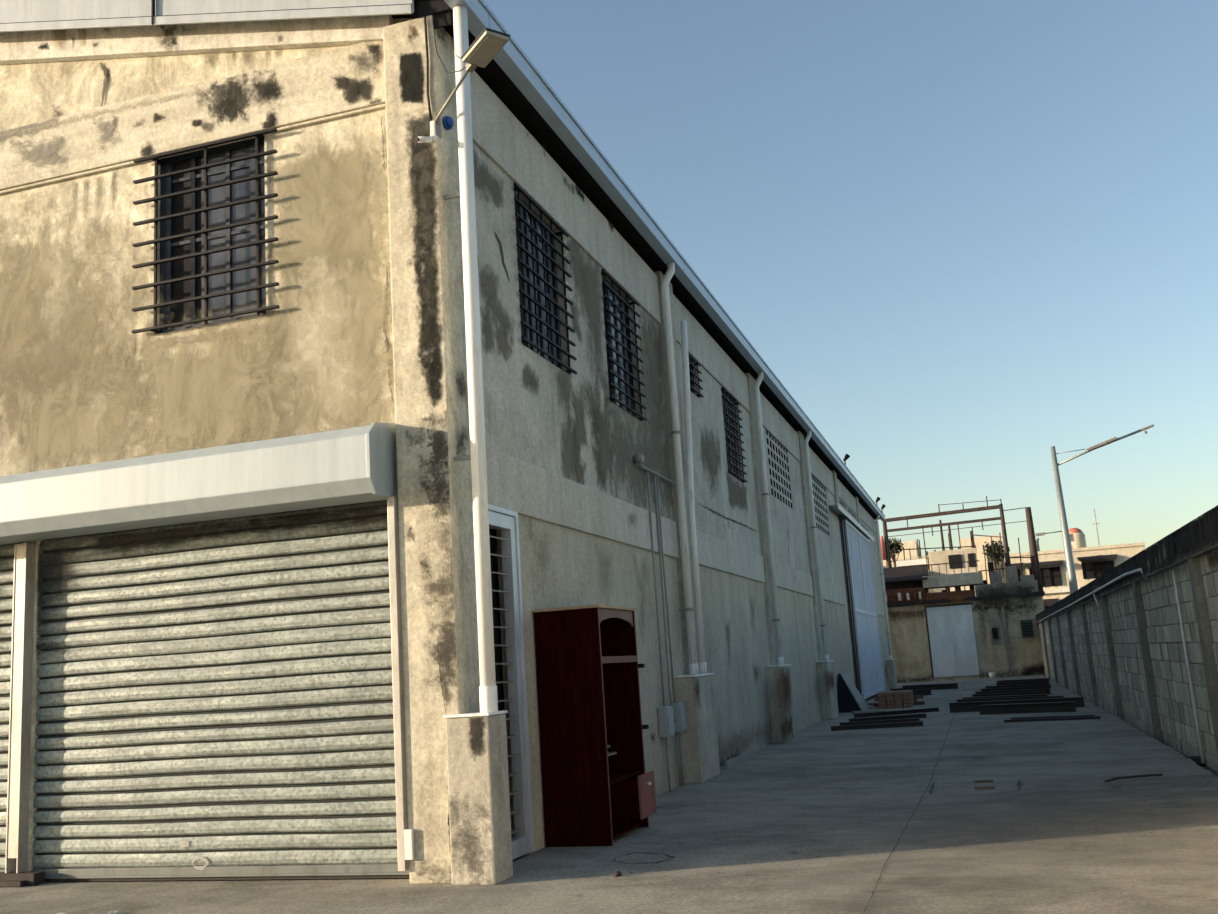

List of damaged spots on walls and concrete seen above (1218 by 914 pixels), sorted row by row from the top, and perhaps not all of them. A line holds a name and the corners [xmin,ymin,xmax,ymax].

leakage [192,52,280,131]
leakage [332,45,380,104]
leakage [473,151,502,207]
leakage [480,269,513,359]
leakage [399,53,467,702]
leakage [558,238,673,519]
leakage [974,505,1218,631]
leakage [468,717,485,756]
leakage [449,800,492,884]